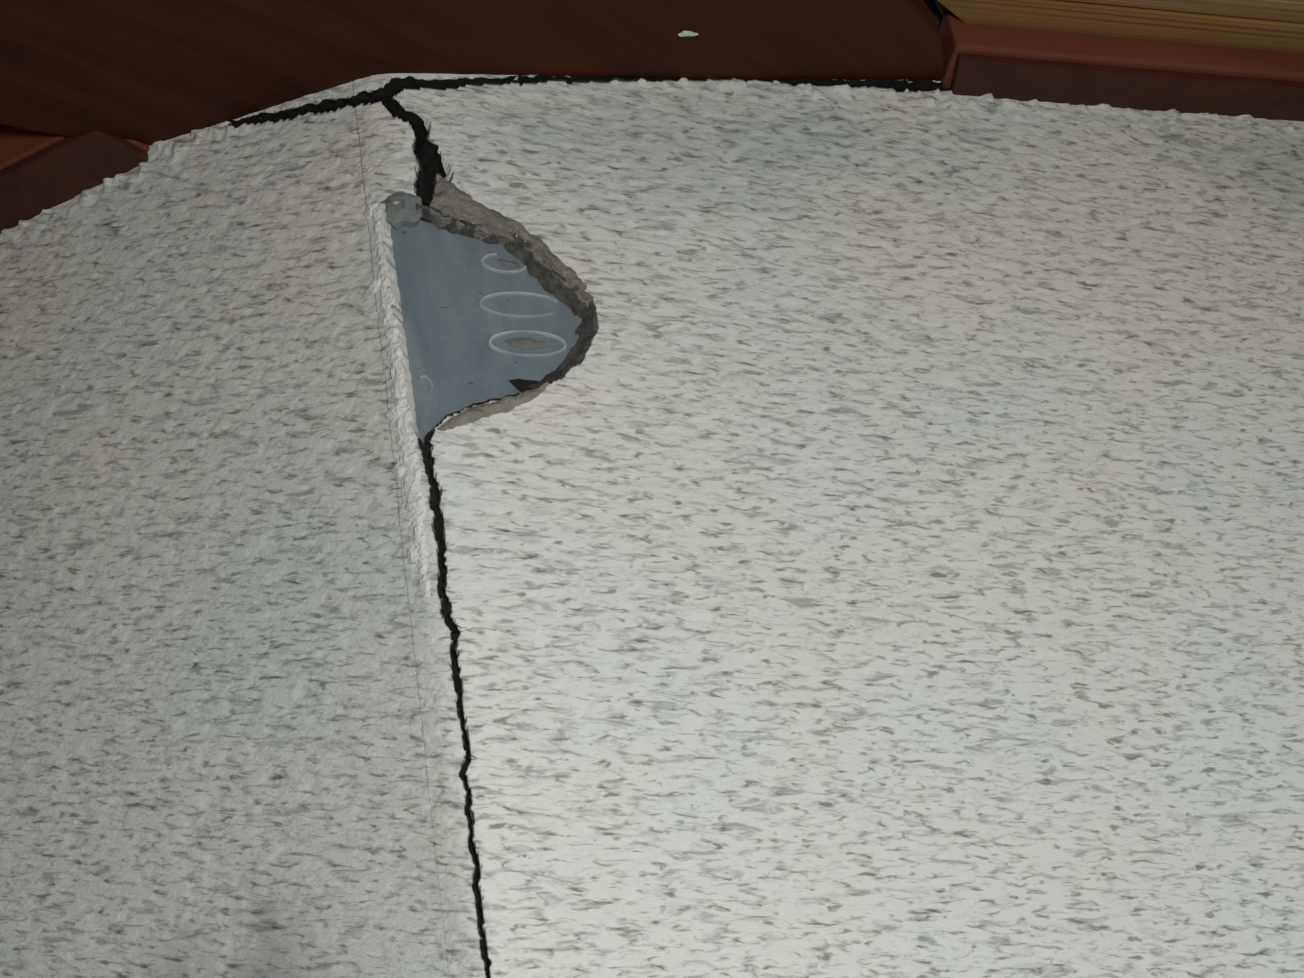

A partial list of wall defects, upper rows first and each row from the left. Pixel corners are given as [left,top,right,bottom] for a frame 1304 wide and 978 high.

crack [228,75,951,223]
flaking render [364,173,598,600]
crack [418,429,490,978]